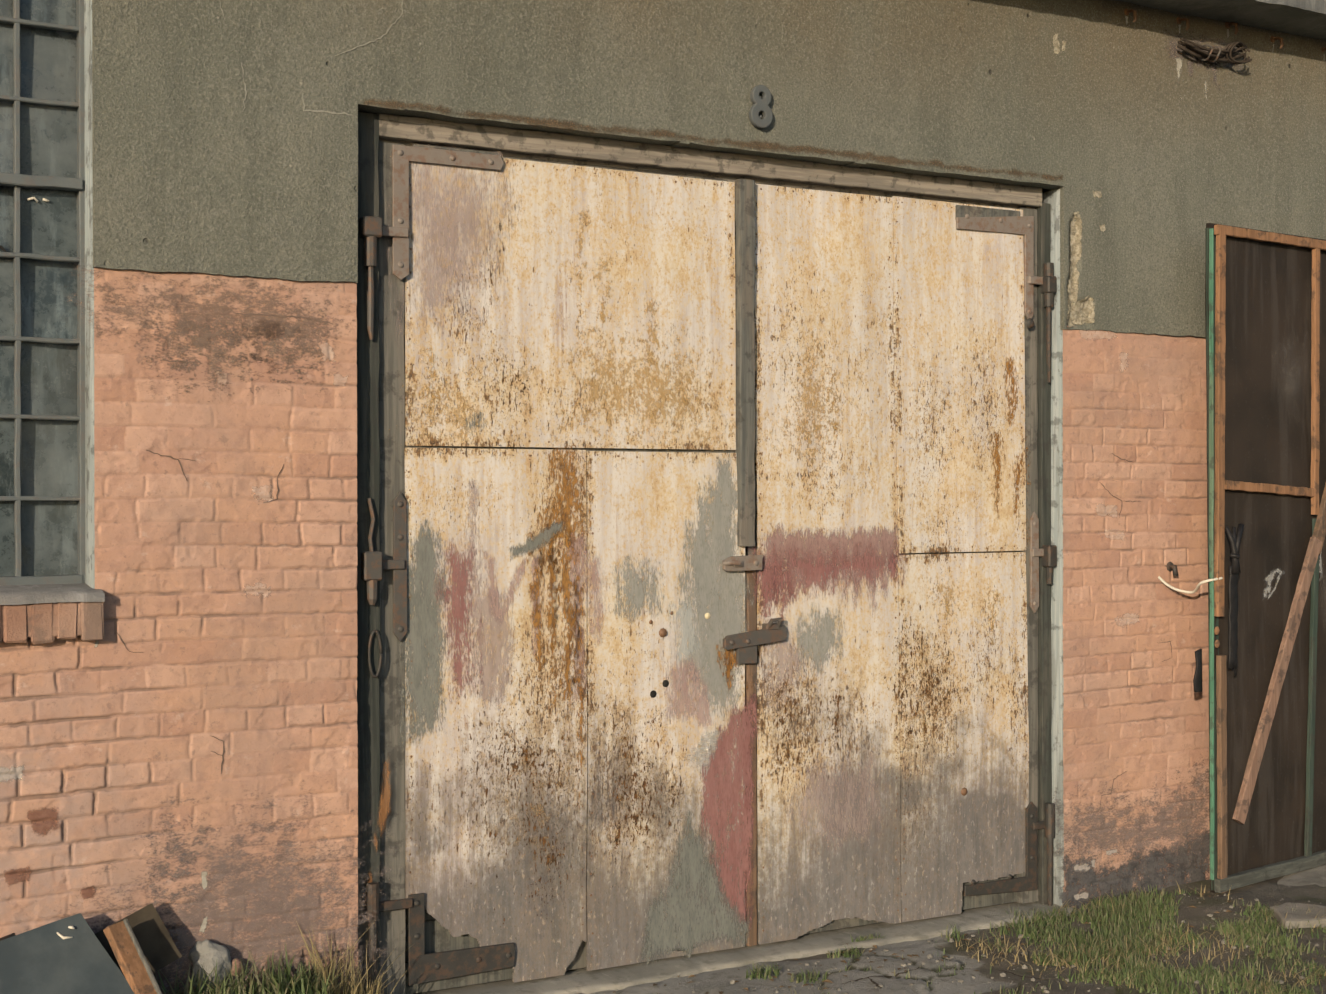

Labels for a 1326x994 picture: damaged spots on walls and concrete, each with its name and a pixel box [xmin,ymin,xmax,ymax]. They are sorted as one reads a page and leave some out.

crack [334,0,403,56]
crack [302,93,351,115]
flaking render [1067,211,1117,340]
leakage [173,320,305,390]
crack [146,450,196,480]
crack [263,464,284,503]
rust [988,433,1031,542]
rust [402,210,734,924]
rust [716,645,848,811]
rust [883,585,968,785]
leakage [91,797,380,994]
leakage [1054,763,1210,909]